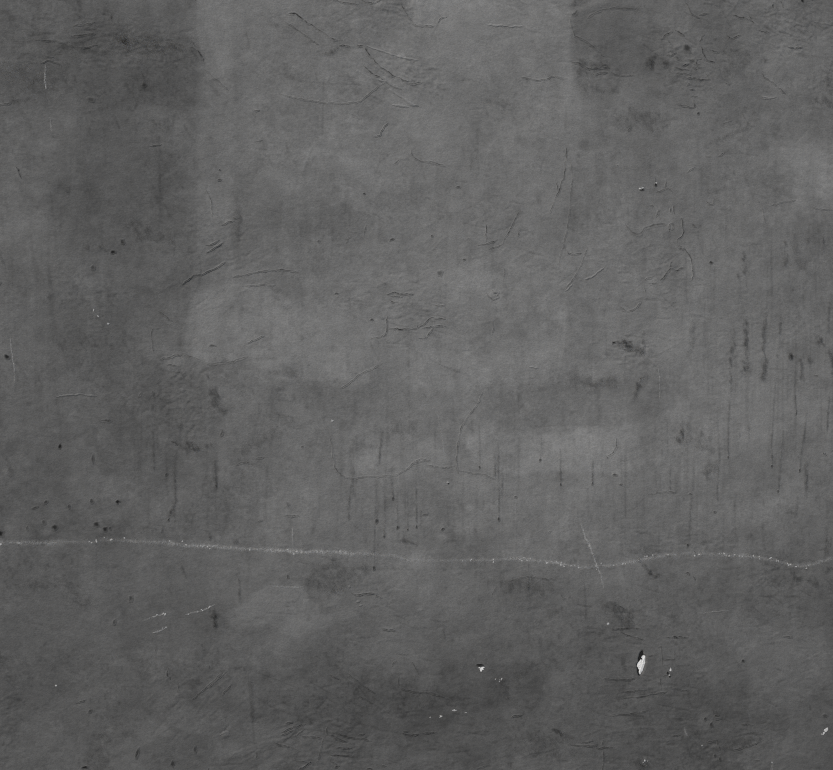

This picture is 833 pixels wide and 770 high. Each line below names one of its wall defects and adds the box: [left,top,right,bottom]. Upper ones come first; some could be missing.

spalling [637,651,645,676]